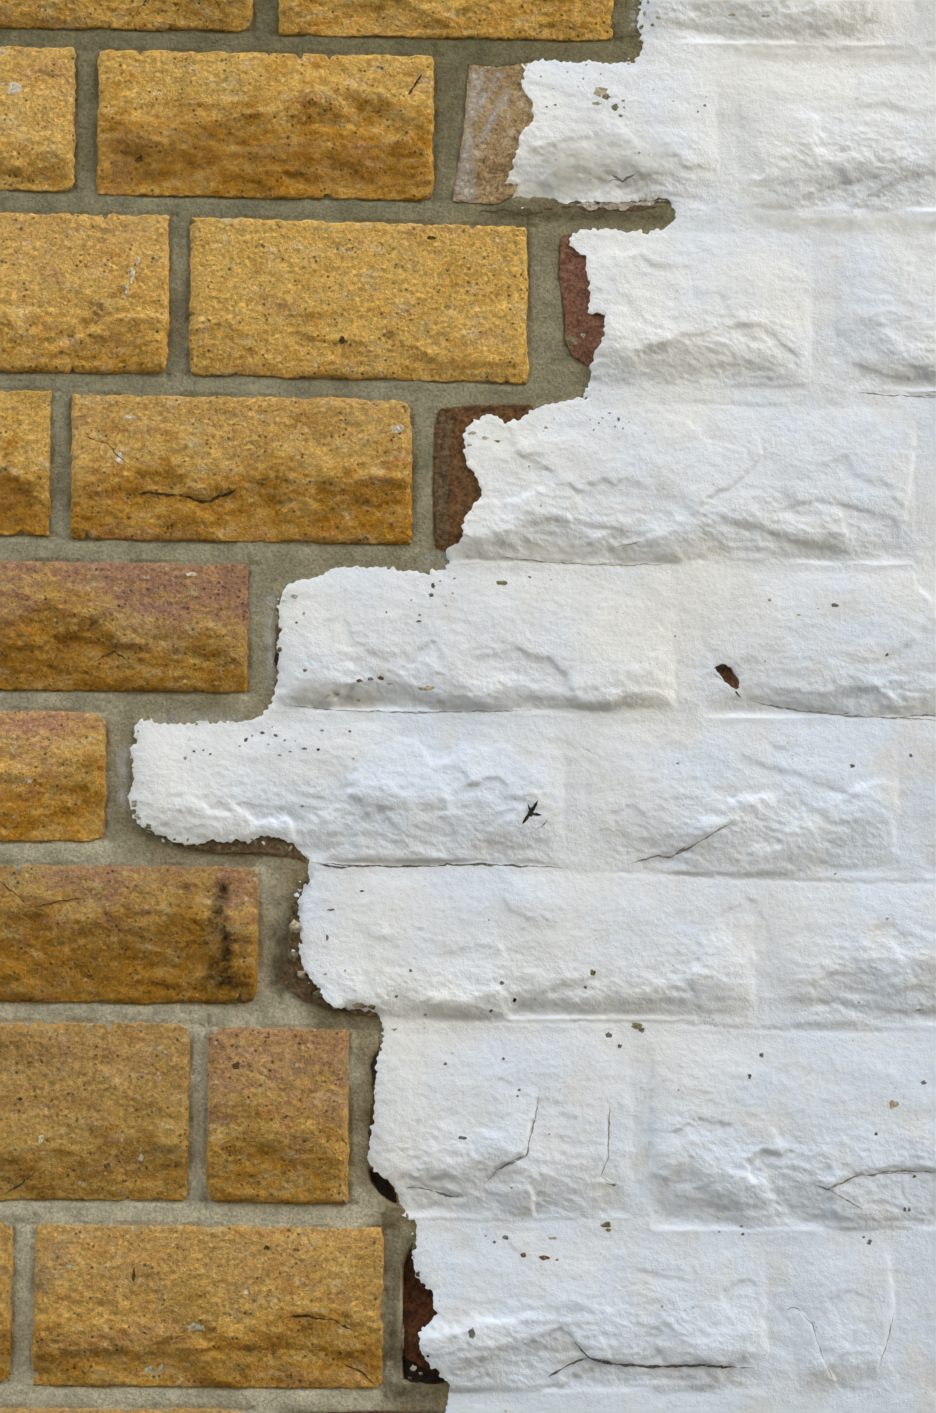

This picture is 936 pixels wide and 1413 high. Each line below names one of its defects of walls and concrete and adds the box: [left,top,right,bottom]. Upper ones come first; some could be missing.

peeling [452,62,557,205]
peeling [566,64,625,117]
spalling [634,0,661,46]
peeling [544,199,667,212]
peeling [559,235,605,367]
peeling [433,405,533,551]
spalling [273,584,305,695]
spalling [127,719,306,862]
spalling [280,880,377,1016]
peeling [400,1207,447,1384]